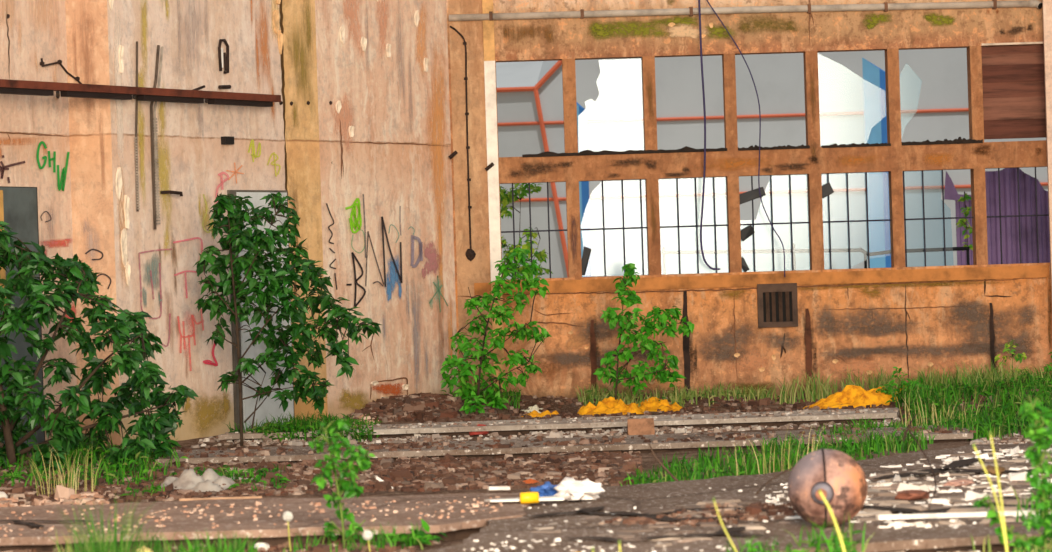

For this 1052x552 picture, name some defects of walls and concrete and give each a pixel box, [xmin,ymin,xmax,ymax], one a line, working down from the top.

leakage [662,17,697,26]
rust [251,0,269,75]
leakage [708,24,748,38]